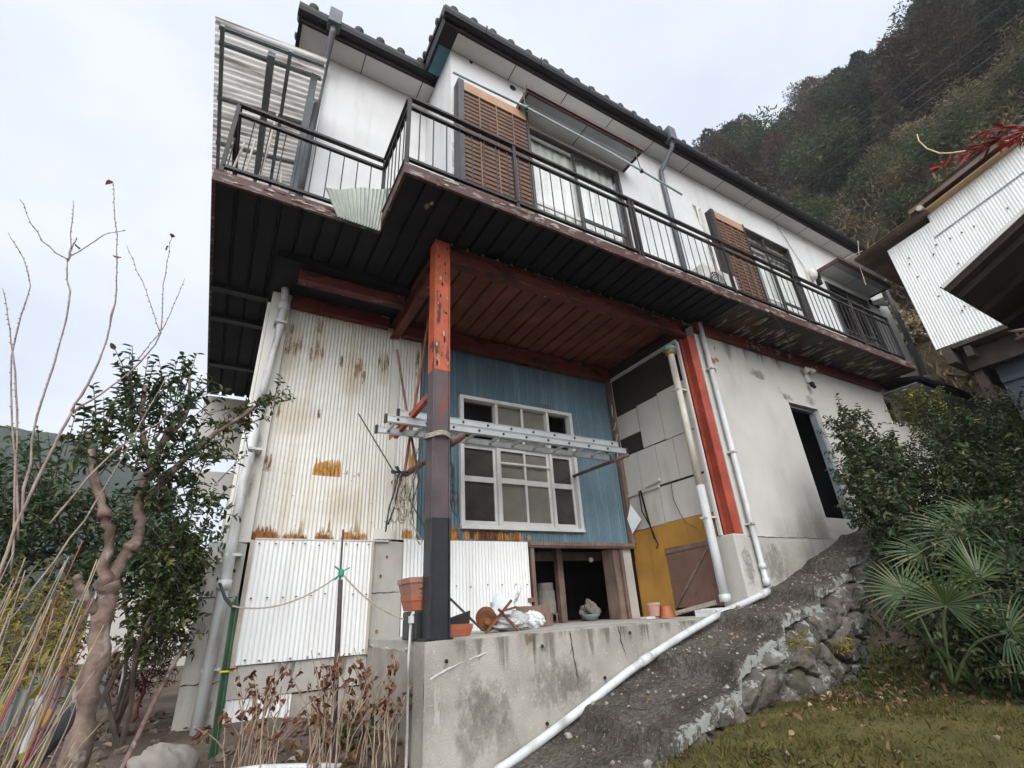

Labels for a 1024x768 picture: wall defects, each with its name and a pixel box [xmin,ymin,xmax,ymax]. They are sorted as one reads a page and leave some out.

corrosion [284,321,324,362]
corrosion [312,458,359,477]
corrosion [251,522,367,540]